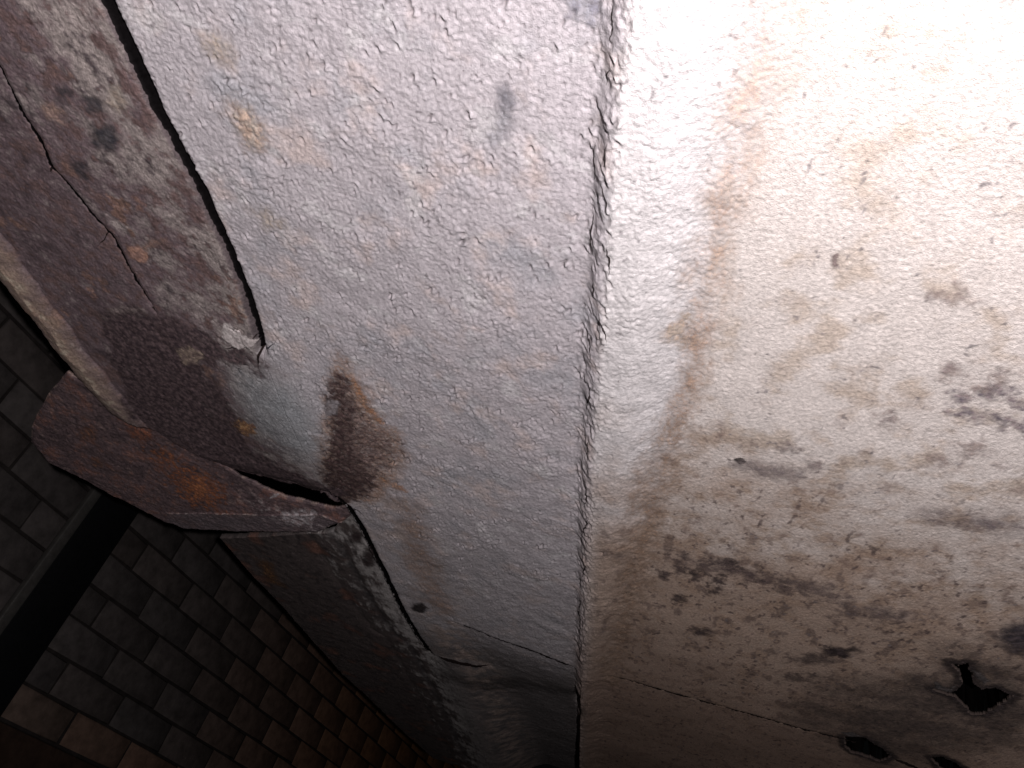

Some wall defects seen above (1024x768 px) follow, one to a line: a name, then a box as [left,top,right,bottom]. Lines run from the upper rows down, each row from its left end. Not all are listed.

crack [0,65,158,314]
crack [101,0,276,364]
crack [587,140,610,362]
water stain [736,462,802,479]
crack [335,496,491,667]
crack [457,443,589,725]
crack [617,677,856,743]
crack [895,759,918,768]
water stain [803,664,1024,766]